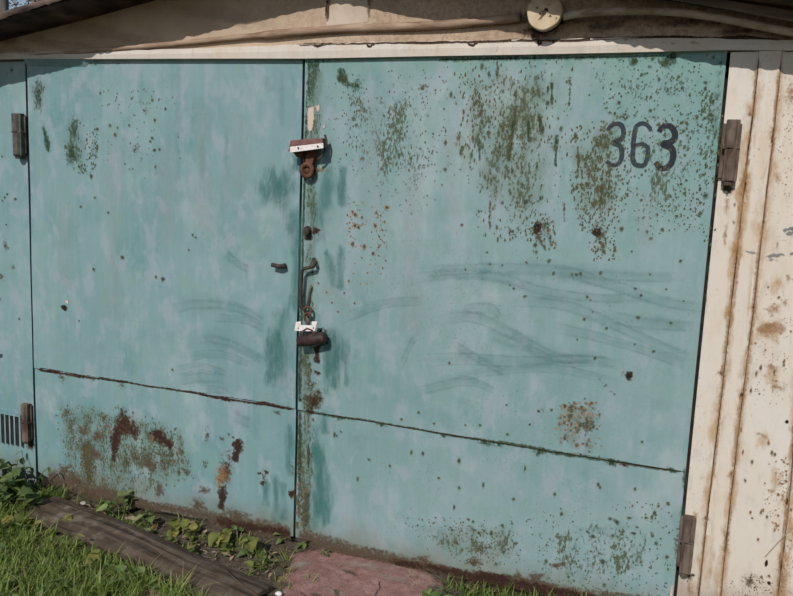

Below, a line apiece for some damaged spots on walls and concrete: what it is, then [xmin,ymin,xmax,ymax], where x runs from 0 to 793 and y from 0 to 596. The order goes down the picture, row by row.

water stain [337,68,350,88]
rust [328,54,714,242]
rust [346,197,389,285]
rust [39,368,293,415]
rust [302,329,681,472]
rust [48,404,678,596]